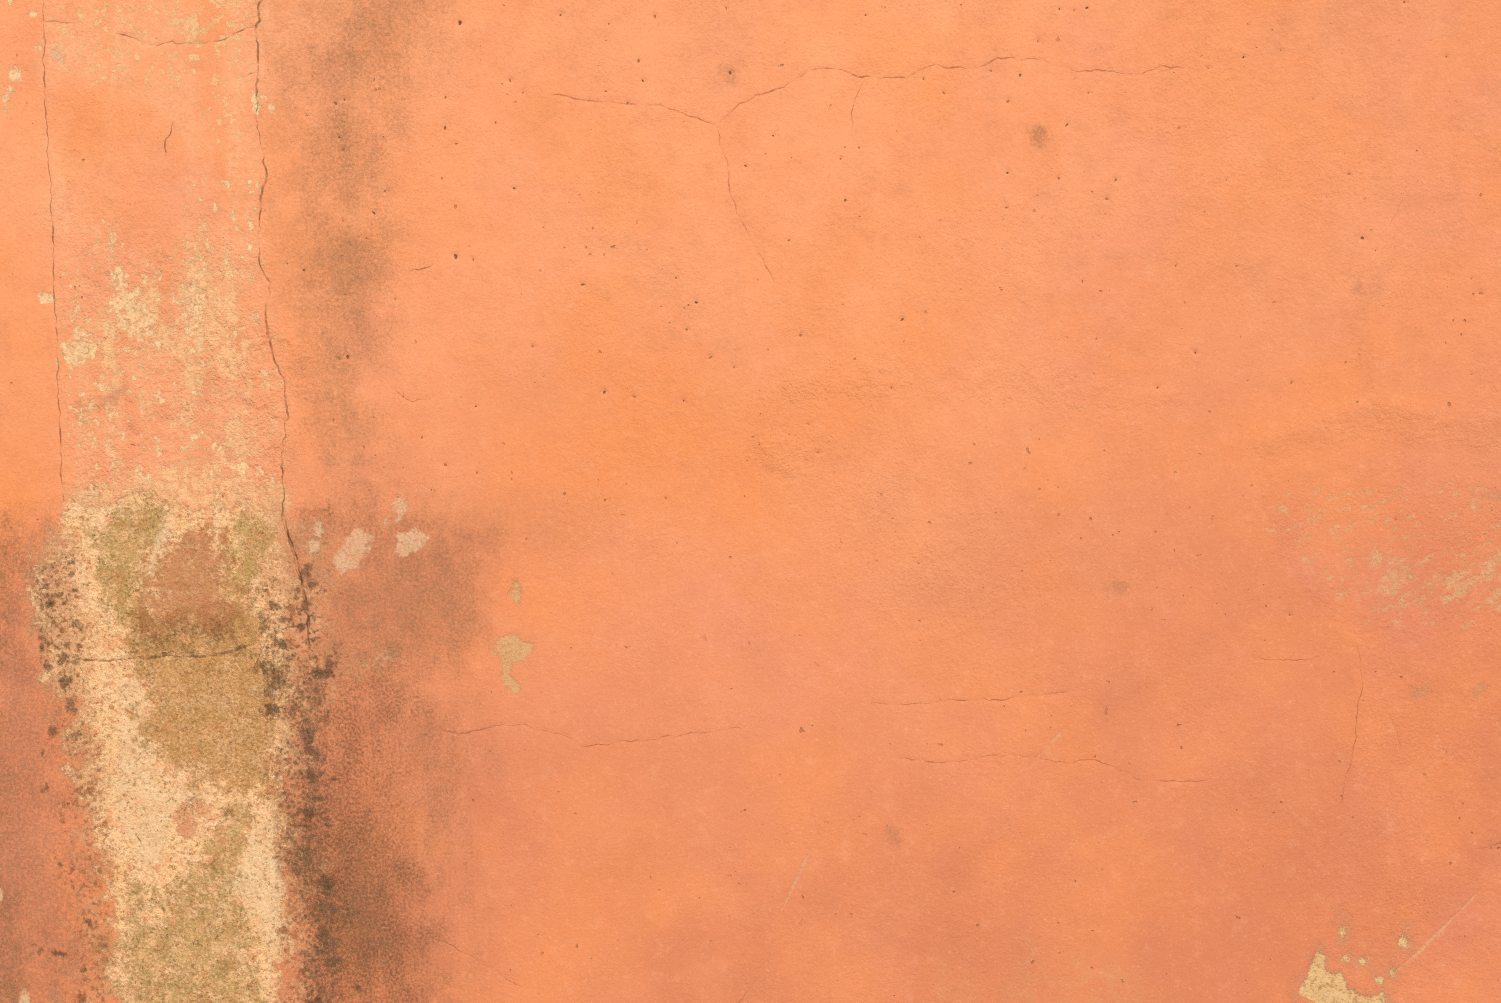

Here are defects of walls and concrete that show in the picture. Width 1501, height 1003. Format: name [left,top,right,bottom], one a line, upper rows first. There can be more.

peeling [309,494,429,574]
peeling [24,180,310,1003]
peeling [491,633,535,693]
leakage [18,489,411,1003]
peeling [1299,926,1398,1003]